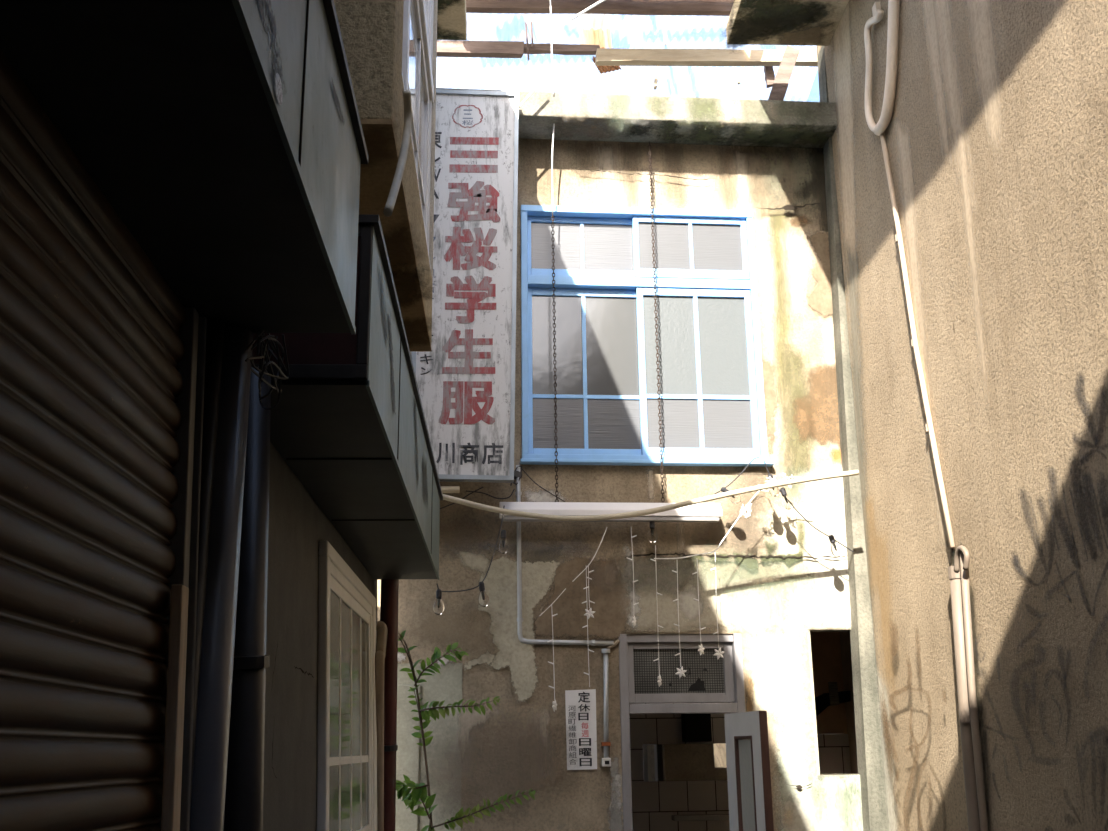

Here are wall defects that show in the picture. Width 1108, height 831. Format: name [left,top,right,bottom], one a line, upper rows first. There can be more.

water stain [437,0,460,13]
water stain [437,27,464,43]
water stain [966,0,1001,147]
water stain [555,95,619,207]
water stain [923,0,988,389]
water stain [627,0,896,831]
water stain [896,122,962,566]
peeling [460,552,560,703]